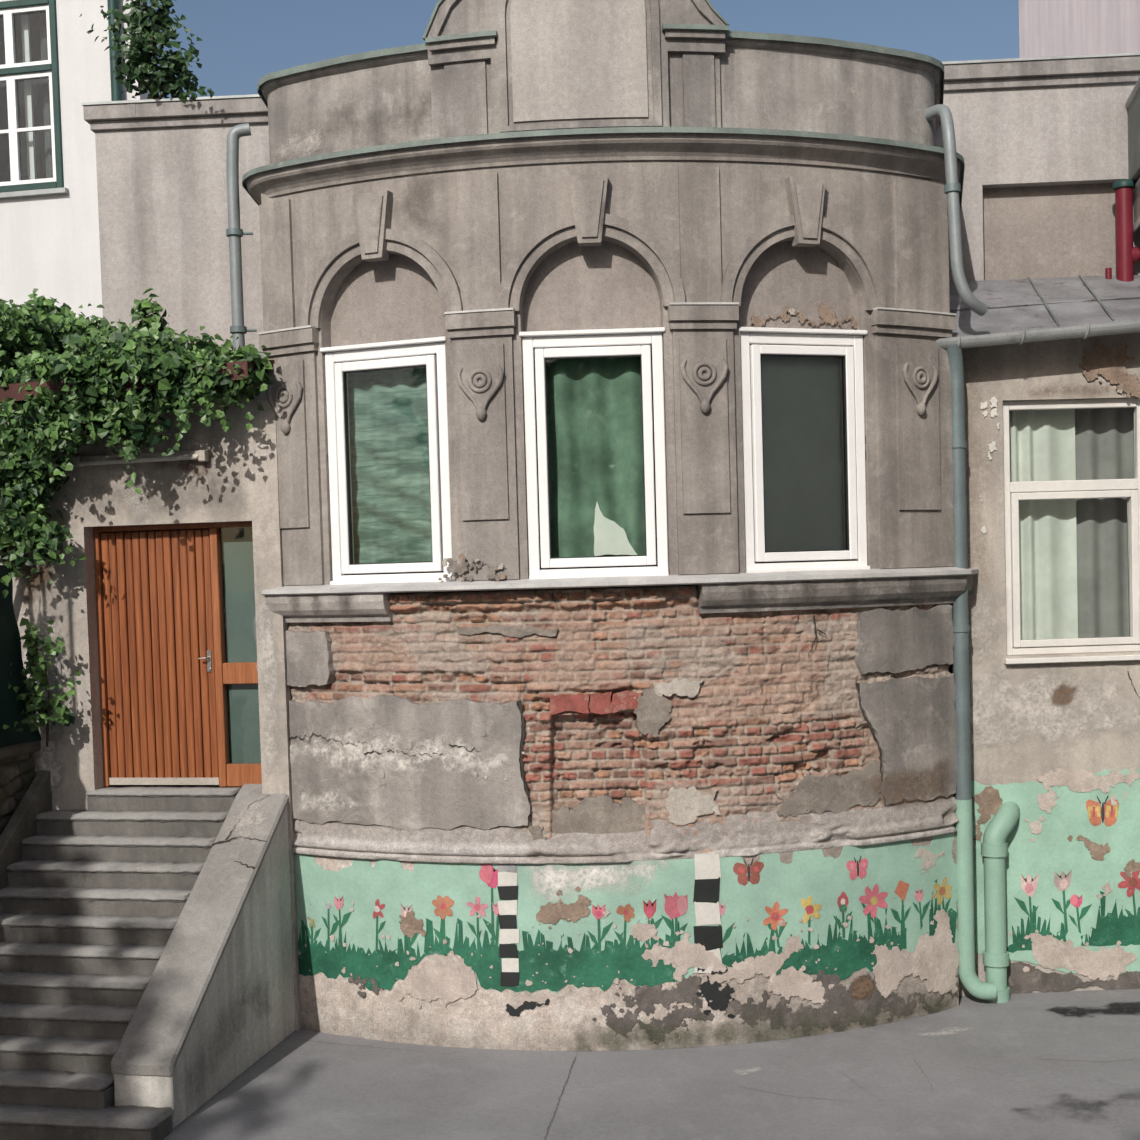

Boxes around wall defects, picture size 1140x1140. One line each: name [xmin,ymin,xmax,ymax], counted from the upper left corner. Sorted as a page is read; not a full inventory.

flaking render [1079,340,1140,399]
flaking render [287,553,950,853]
crack [849,683,886,805]
crack [212,795,269,869]
peeling [971,785,1003,841]
peeling [1025,768,1140,842]
peeling [1067,835,1110,861]
peeling [532,886,616,934]
peeling [381,911,493,1009]
peeling [592,895,960,1045]
peeling [1009,930,1137,981]
leakage [1007,962,1140,1017]